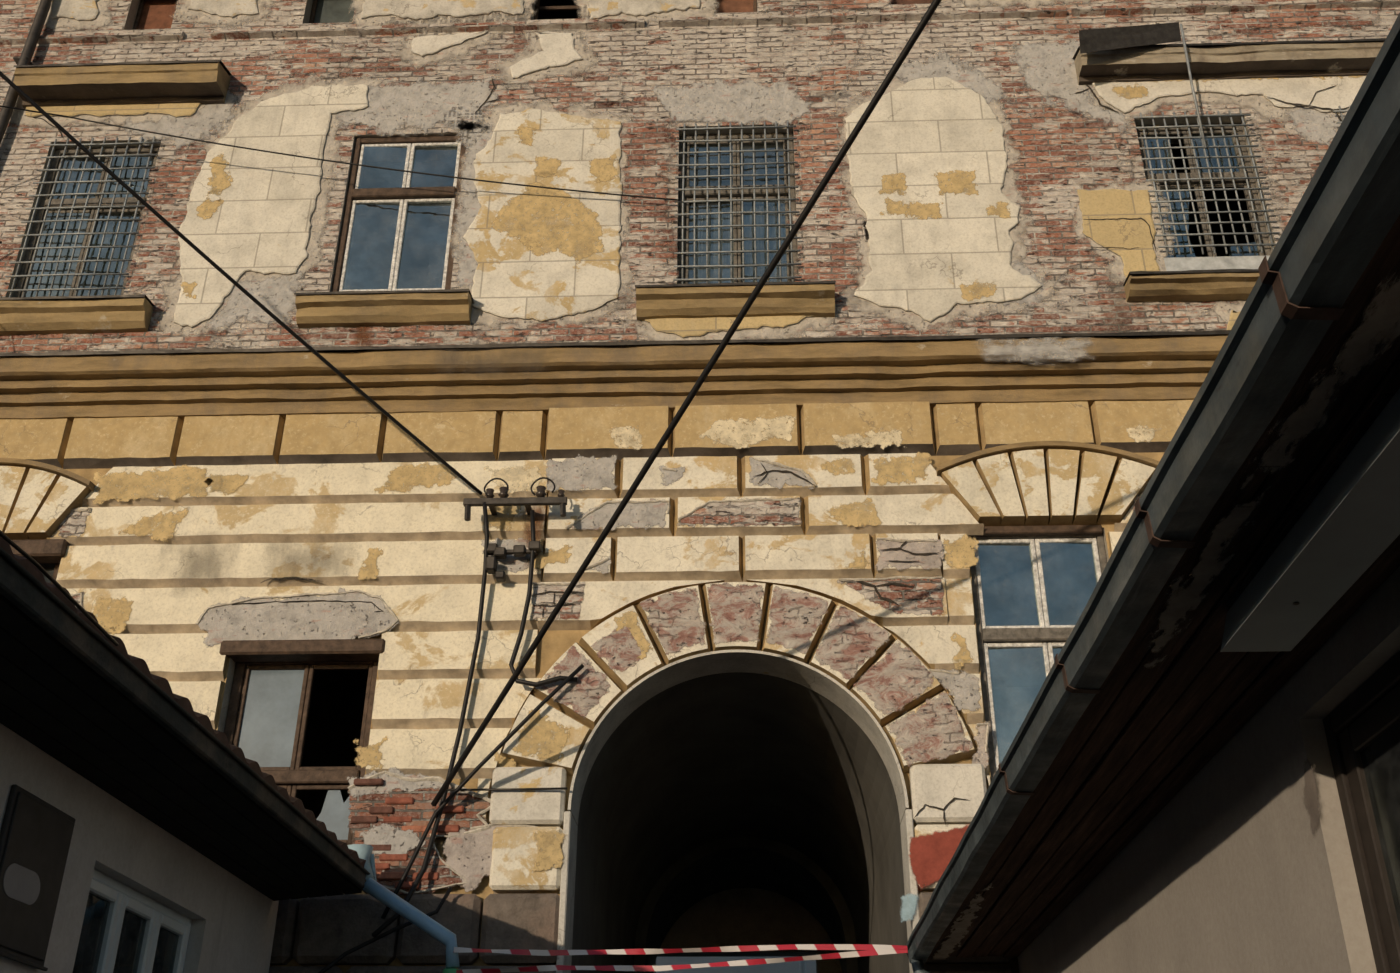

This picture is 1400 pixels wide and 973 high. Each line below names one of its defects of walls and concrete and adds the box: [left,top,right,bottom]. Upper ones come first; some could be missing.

flaking render [11,0,1380,353]
peeling [1145,276,1400,668]
spalling [196,548,399,647]
spalling [481,415,991,768]
crack [856,541,939,605]
flaking render [347,736,565,895]
crack [914,797,967,825]